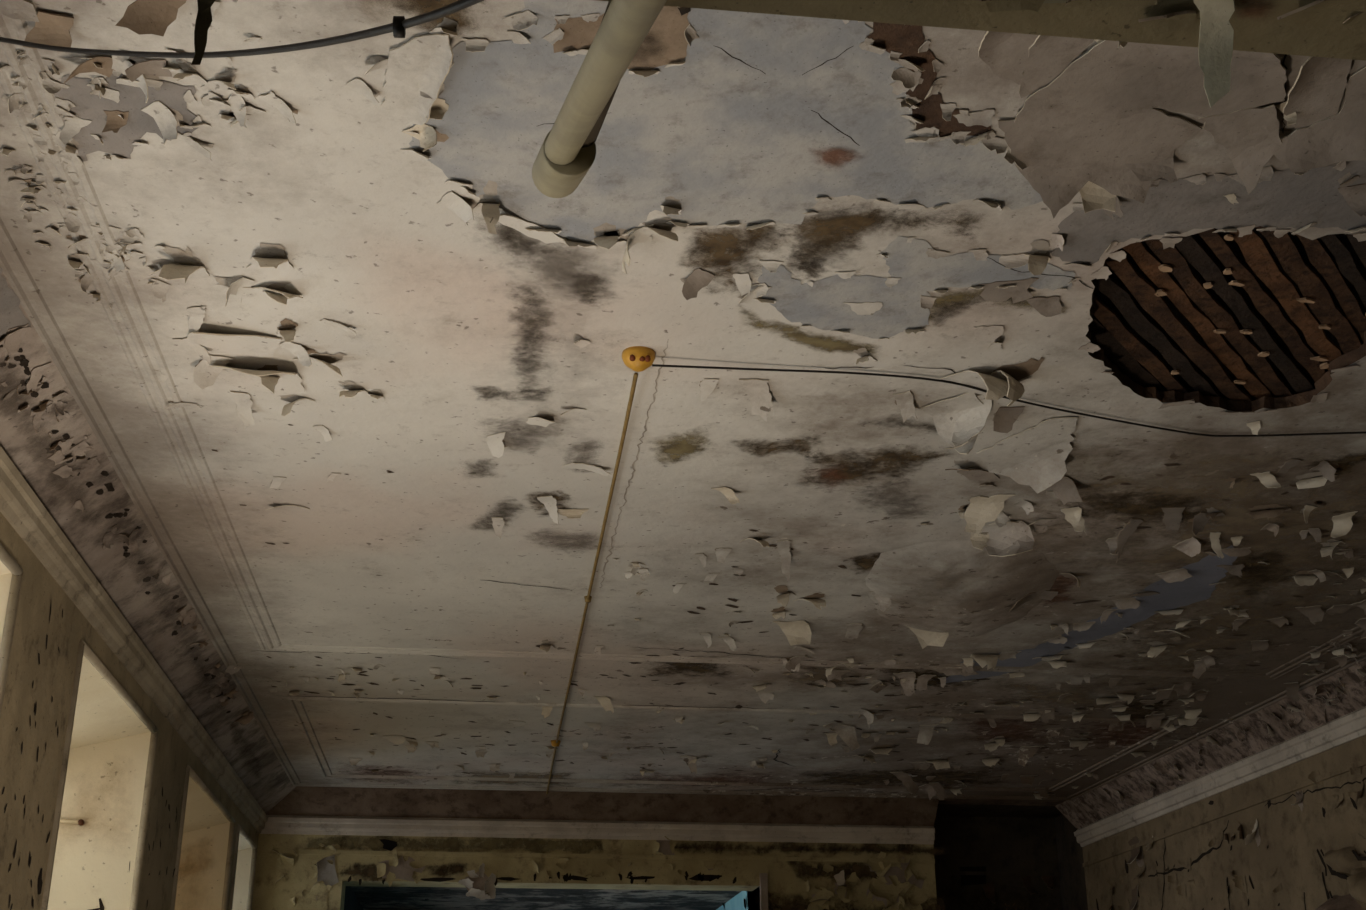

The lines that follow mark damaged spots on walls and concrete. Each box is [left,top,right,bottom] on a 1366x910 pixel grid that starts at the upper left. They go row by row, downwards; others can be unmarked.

peeling [345,0,1366,365]
leakage [687,210,926,286]
leakage [744,312,874,353]
leakage [475,492,568,529]
peeling [526,406,587,427]
leakage [660,434,704,462]
leakage [740,437,944,515]
peeling [695,459,1366,800]
crack [1265,777,1366,806]
peeling [271,836,737,910]
crack [1148,820,1229,910]
crack [1304,848,1366,910]